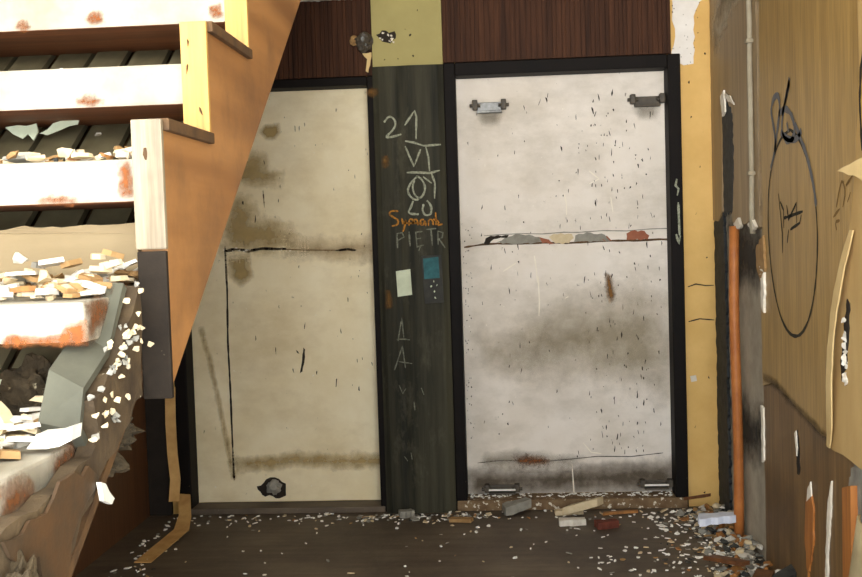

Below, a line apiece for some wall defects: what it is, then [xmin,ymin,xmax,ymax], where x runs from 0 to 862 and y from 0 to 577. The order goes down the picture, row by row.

peeling [671,0,701,65]
crack [854,56,862,151]
corrosion [119,163,133,196]
damp [228,201,280,247]
damp [231,258,250,281]
corrosion [606,275,614,300]
corrosion [3,300,108,347]
corrosion [3,480,33,515]
spalling [257,477,286,498]
damp [245,455,380,468]
damp [473,465,672,492]
flaking render [848,464,862,523]